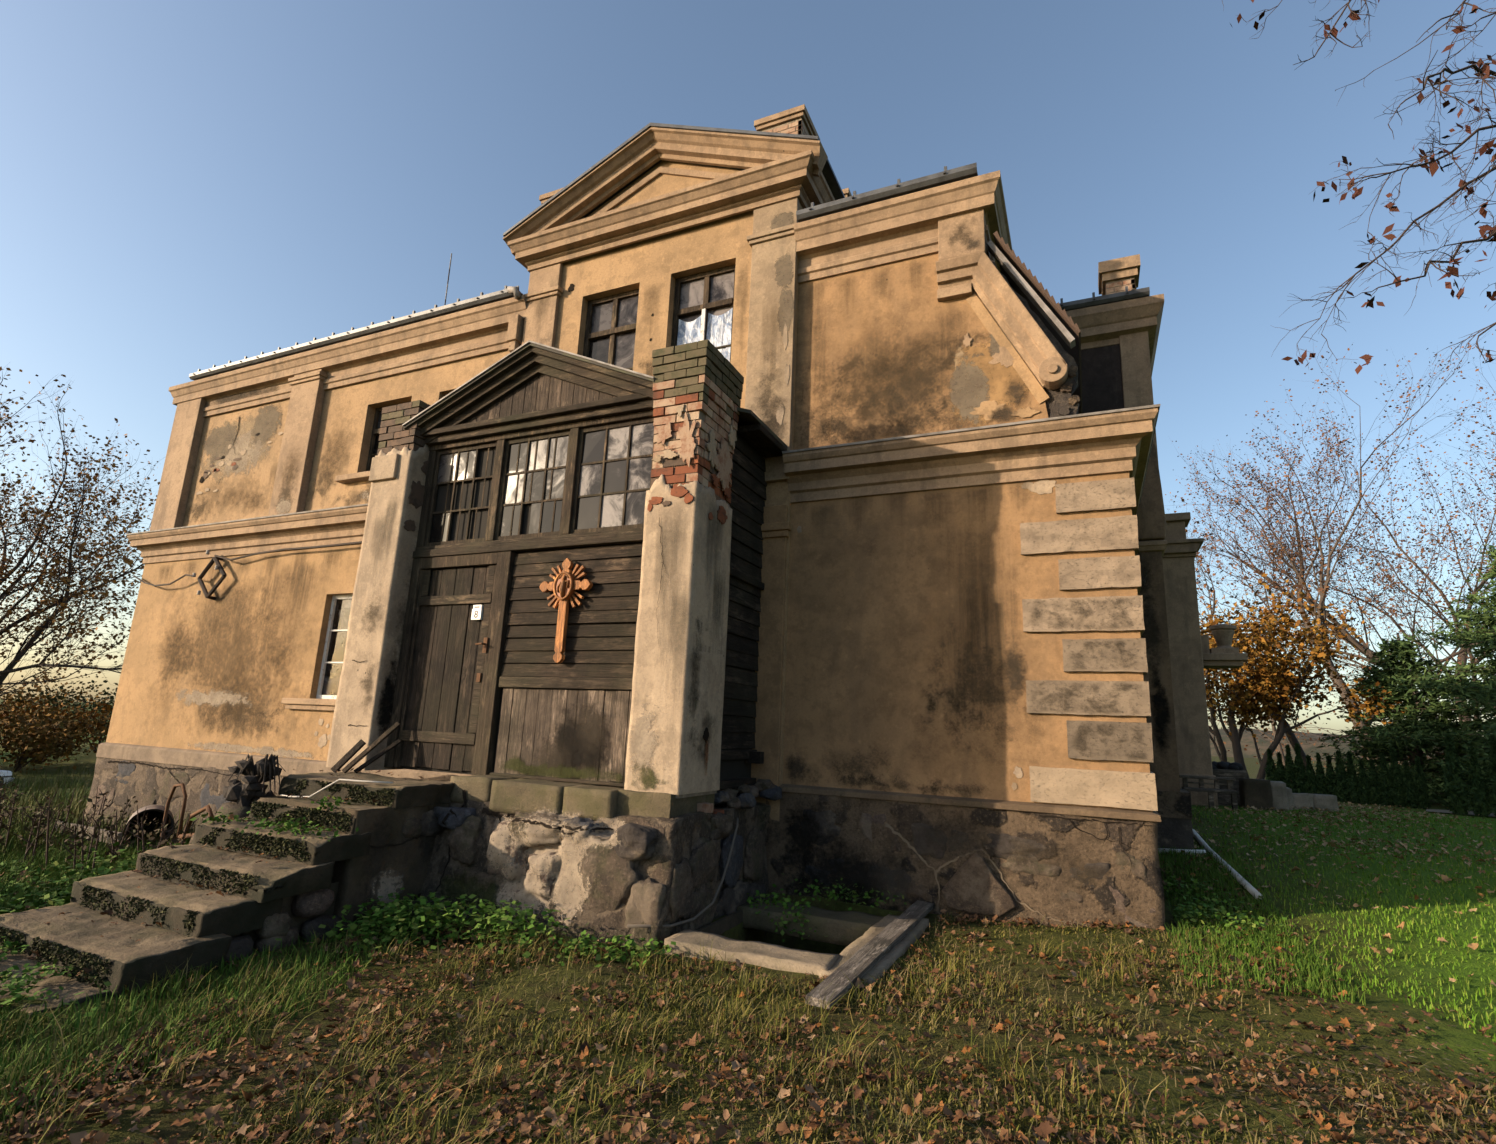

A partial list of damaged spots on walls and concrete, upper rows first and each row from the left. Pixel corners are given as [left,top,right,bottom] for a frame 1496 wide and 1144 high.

water stain [817,343,975,445]
flaking render [950,326,1080,427]
flaking render [196,404,284,495]
flaking render [647,404,737,524]
water stain [168,617,312,758]
water stain [928,650,1025,718]